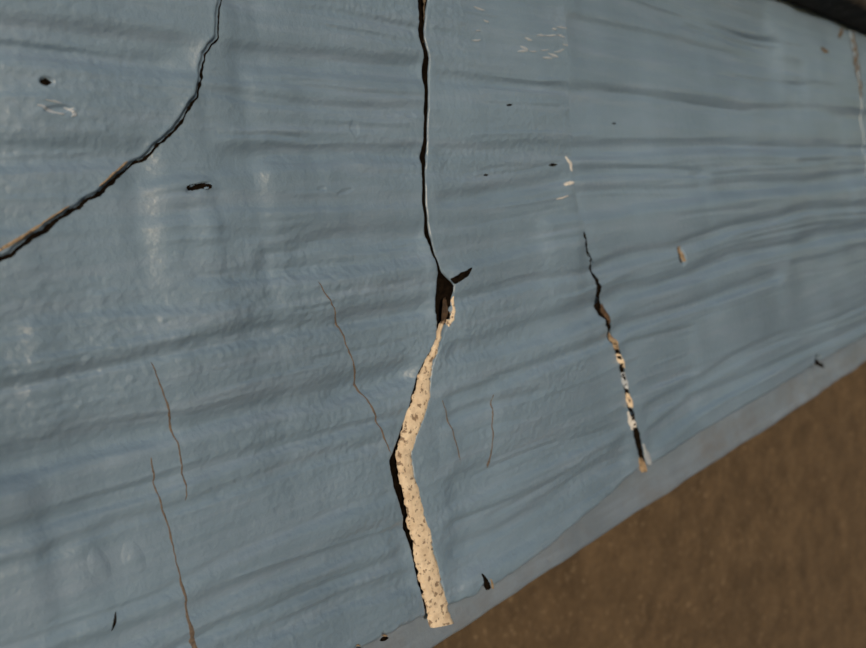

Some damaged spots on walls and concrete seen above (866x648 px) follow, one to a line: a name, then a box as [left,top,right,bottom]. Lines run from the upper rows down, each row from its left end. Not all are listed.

crack [0,0,222,261]
crack [151,363,187,500]
crack [319,0,472,628]
crack [486,394,494,467]
crack [583,232,644,461]
crack [151,458,198,648]